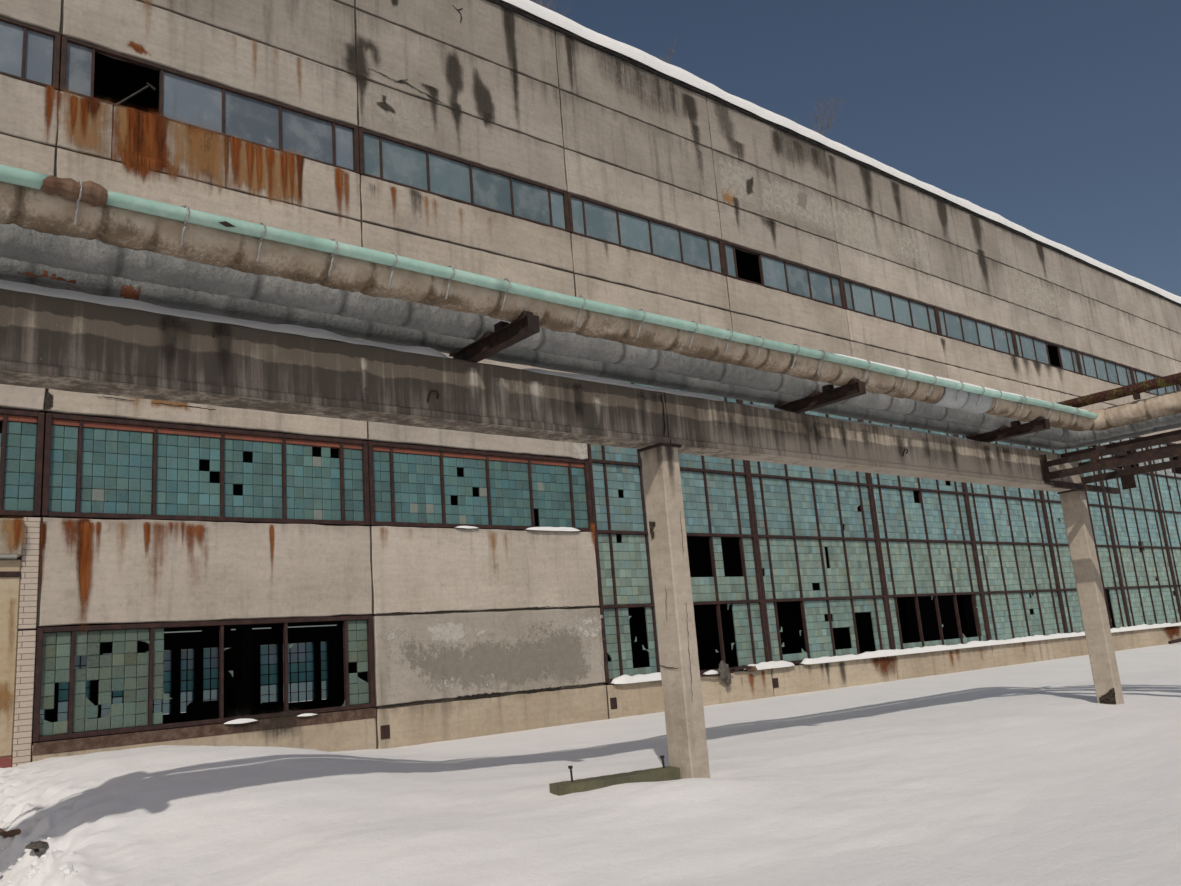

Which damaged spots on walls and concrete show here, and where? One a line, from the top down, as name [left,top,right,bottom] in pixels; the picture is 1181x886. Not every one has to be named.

water stain [347,38,378,102]
water stain [423,54,494,127]
rust [45,85,304,202]
water stain [859,165,872,203]
water stain [892,181,901,214]
water stain [937,200,947,229]
water stain [970,215,988,282]
water stain [215,323,231,368]
rust [3,518,25,552]
rust [65,518,101,607]
rust [144,522,204,552]
spalling [383,615,604,693]